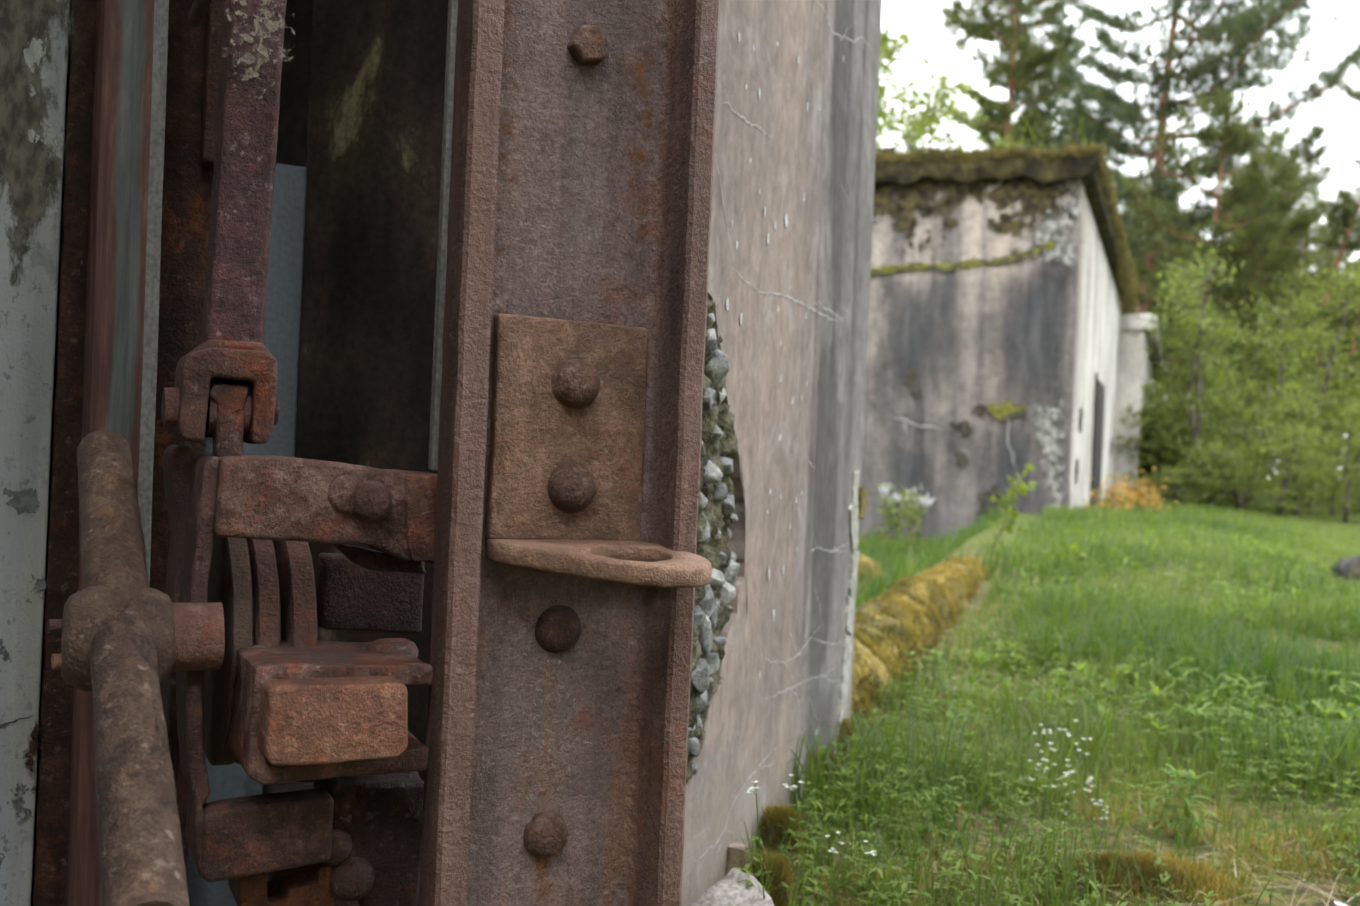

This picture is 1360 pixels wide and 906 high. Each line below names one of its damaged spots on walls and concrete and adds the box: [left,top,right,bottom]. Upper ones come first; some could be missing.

peeling [23,31,47,97]
peeling [28,128,67,148]
crack [724,89,772,138]
crack [716,160,847,322]
leakage [1006,274,1064,390]
leakage [984,426,1030,515]
spalling [686,297,748,784]
crack [0,713,37,728]